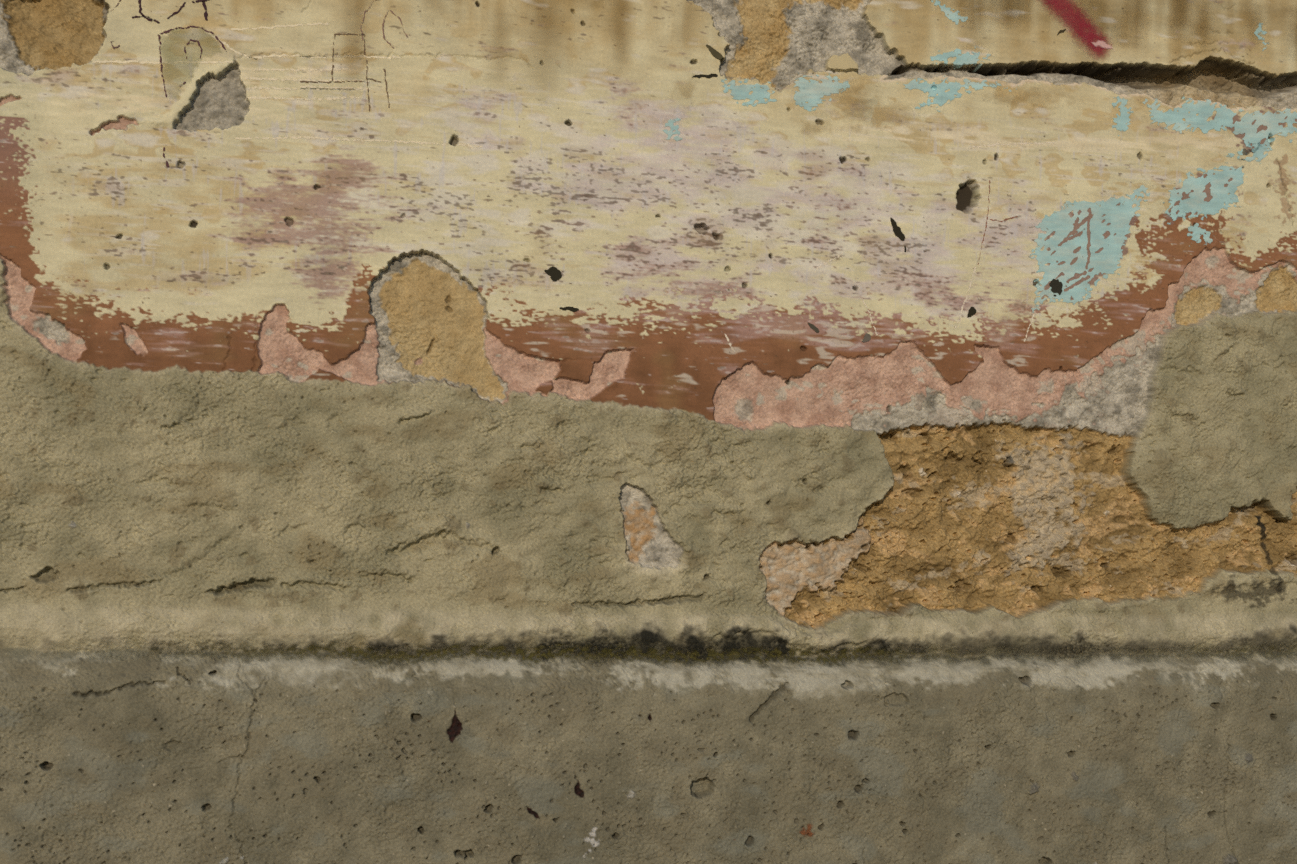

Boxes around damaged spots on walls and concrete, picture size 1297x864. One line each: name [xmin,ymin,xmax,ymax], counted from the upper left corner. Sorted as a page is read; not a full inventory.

spalling [0,0,108,76]
spalling [90,58,250,136]
peeling [0,246,93,363]
peeling [118,318,152,362]
spalling [251,251,637,404]
spalling [687,0,1297,630]
spalling [619,484,683,569]